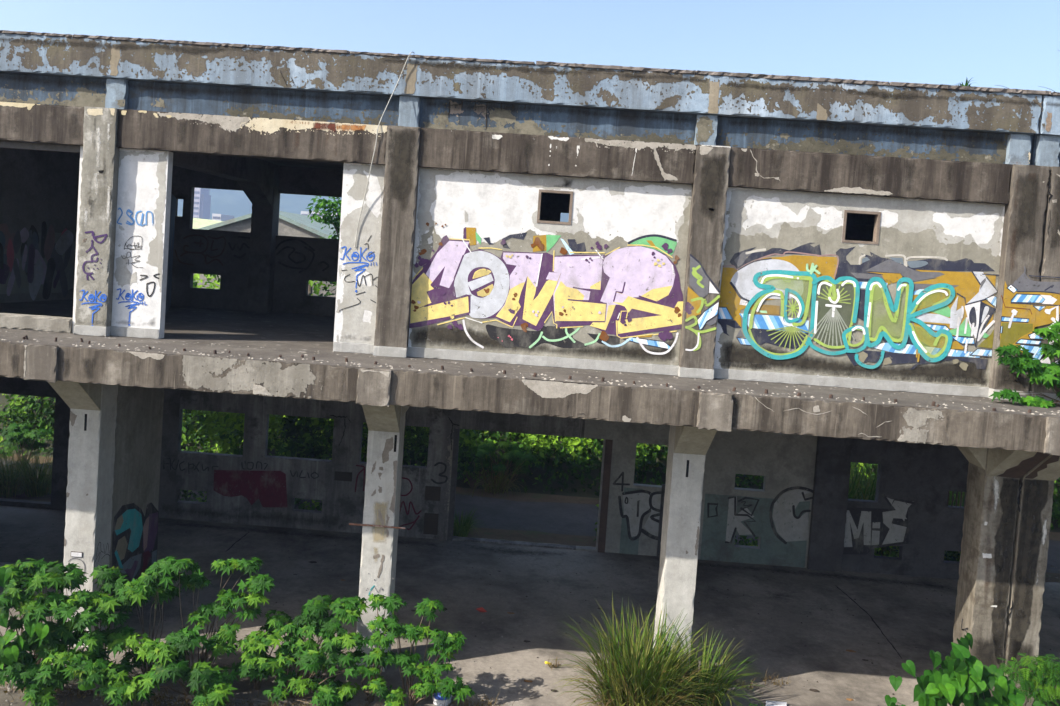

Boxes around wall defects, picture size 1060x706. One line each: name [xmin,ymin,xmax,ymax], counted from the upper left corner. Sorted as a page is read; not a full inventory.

corrosion [292,121,366,132]
crack [632,147,678,181]
peeling [0,36,1052,387]
peeling [180,355,323,399]
spalling [522,378,598,398]
spalling [898,407,945,444]